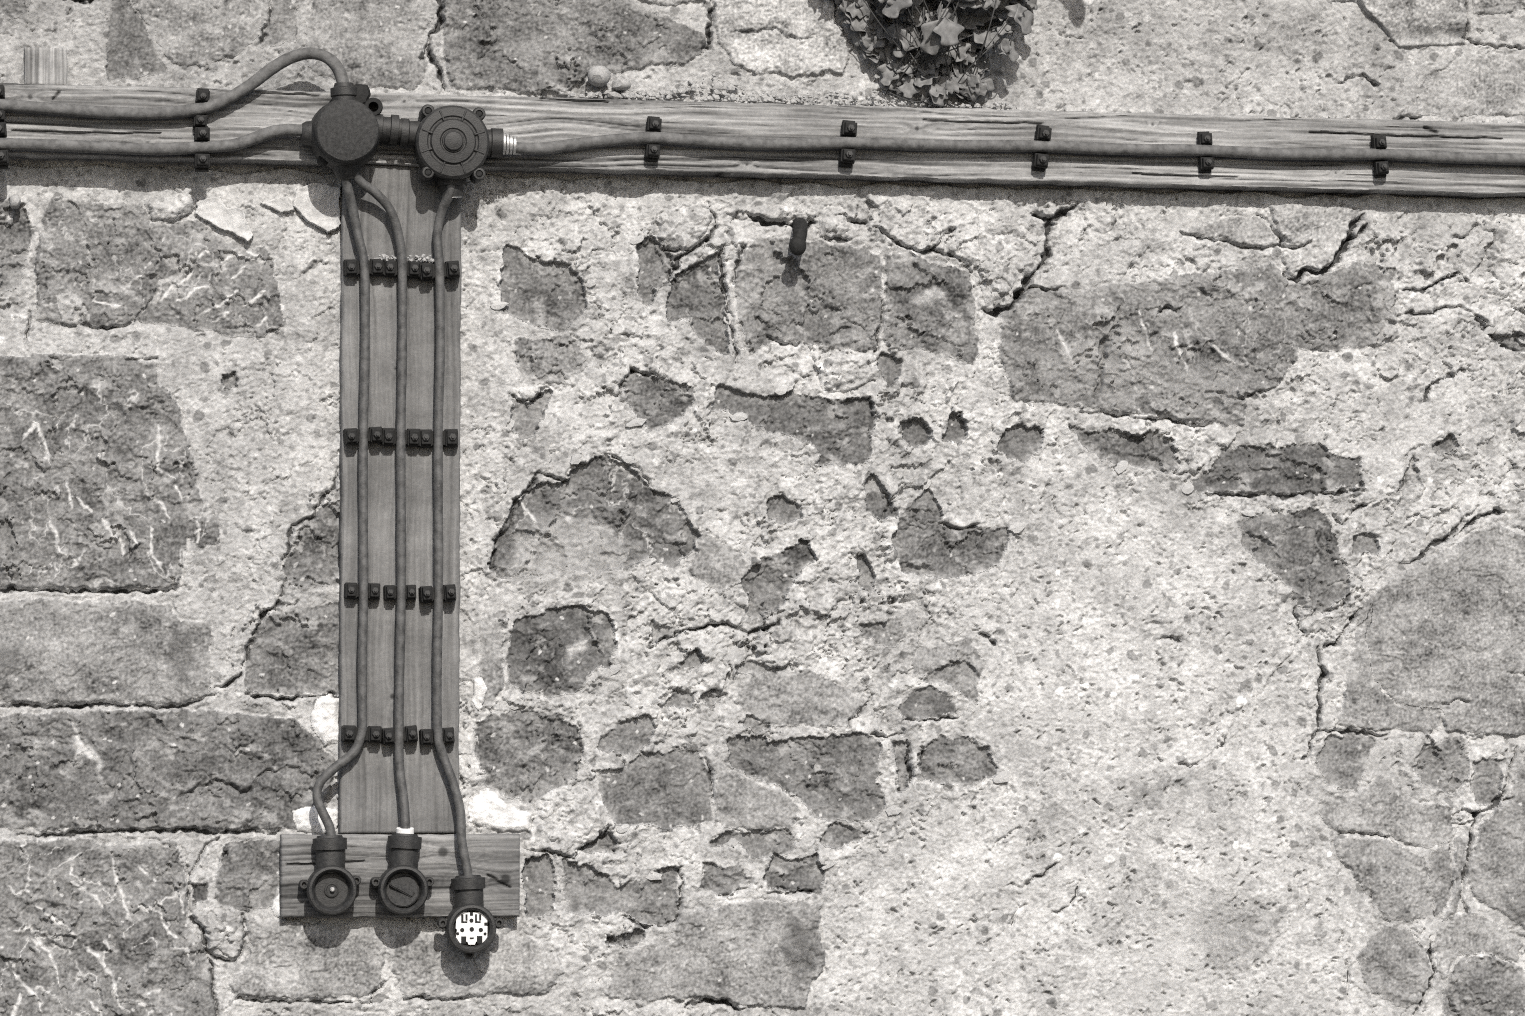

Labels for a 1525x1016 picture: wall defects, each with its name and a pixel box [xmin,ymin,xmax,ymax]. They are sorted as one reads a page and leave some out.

spalling [490,244,596,332]
spalling [628,235,733,354]
crack [983,205,1076,318]
crack [1190,215,1366,283]
crack [0,472,339,710]
spalling [487,454,701,578]
spalling [741,494,817,619]
spalling [621,371,1025,579]
spalling [1069,425,1381,614]
crack [1293,595,1375,759]
spalling [474,605,1010,949]
crack [1449,753,1515,913]